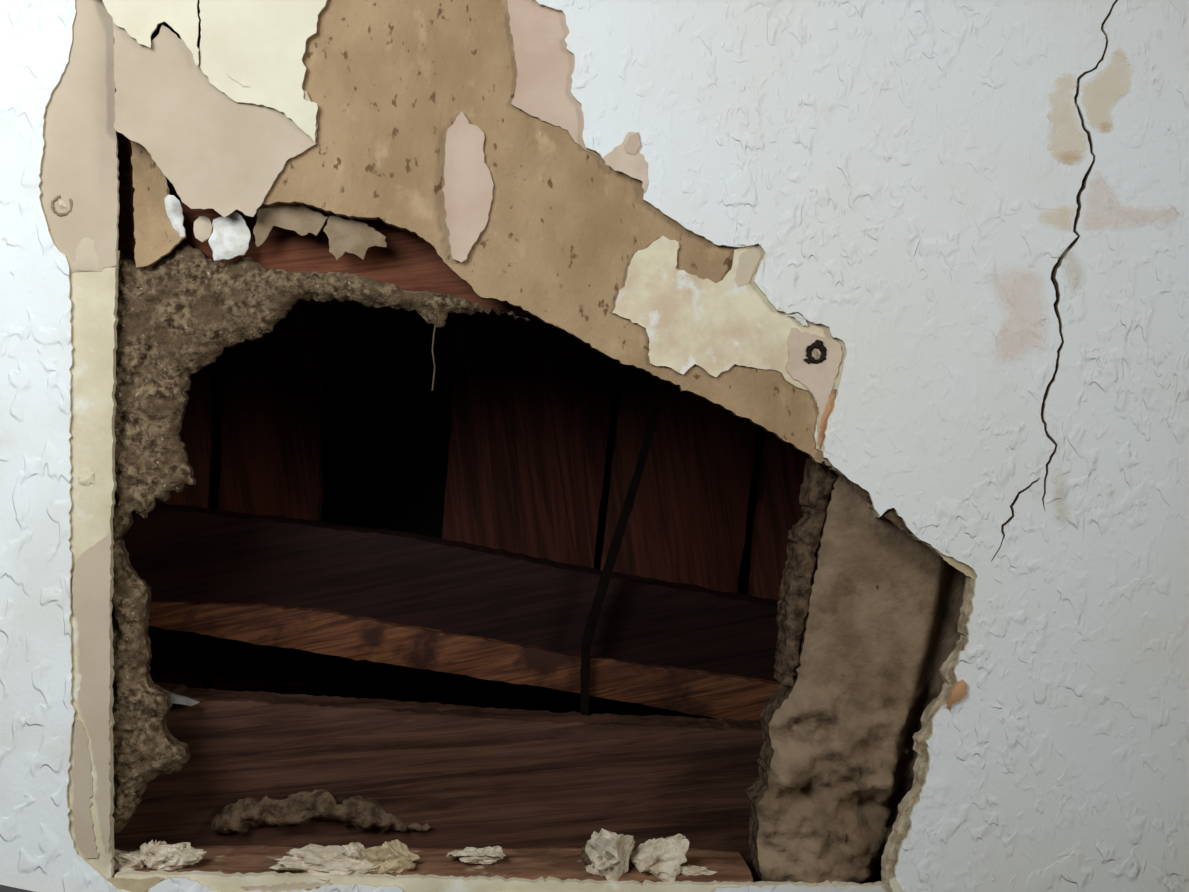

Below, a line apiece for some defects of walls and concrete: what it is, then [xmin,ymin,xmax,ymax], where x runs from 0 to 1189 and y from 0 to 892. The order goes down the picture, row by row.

peeling [102,0,327,261]
peeling [442,112,494,263]
peeling [507,0,648,193]
crack [992,0,1118,560]
flaking render [68,235,976,892]